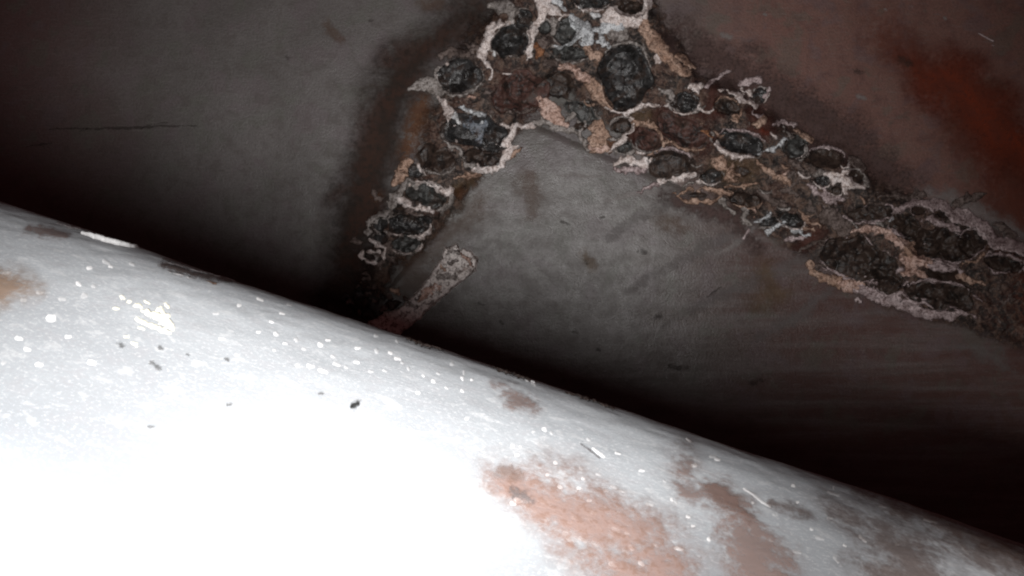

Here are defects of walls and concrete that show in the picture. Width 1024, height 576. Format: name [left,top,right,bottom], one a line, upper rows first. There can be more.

corrosion [318,0,1024,322]
corrosion [488,465,695,576]
corrosion [674,457,796,576]